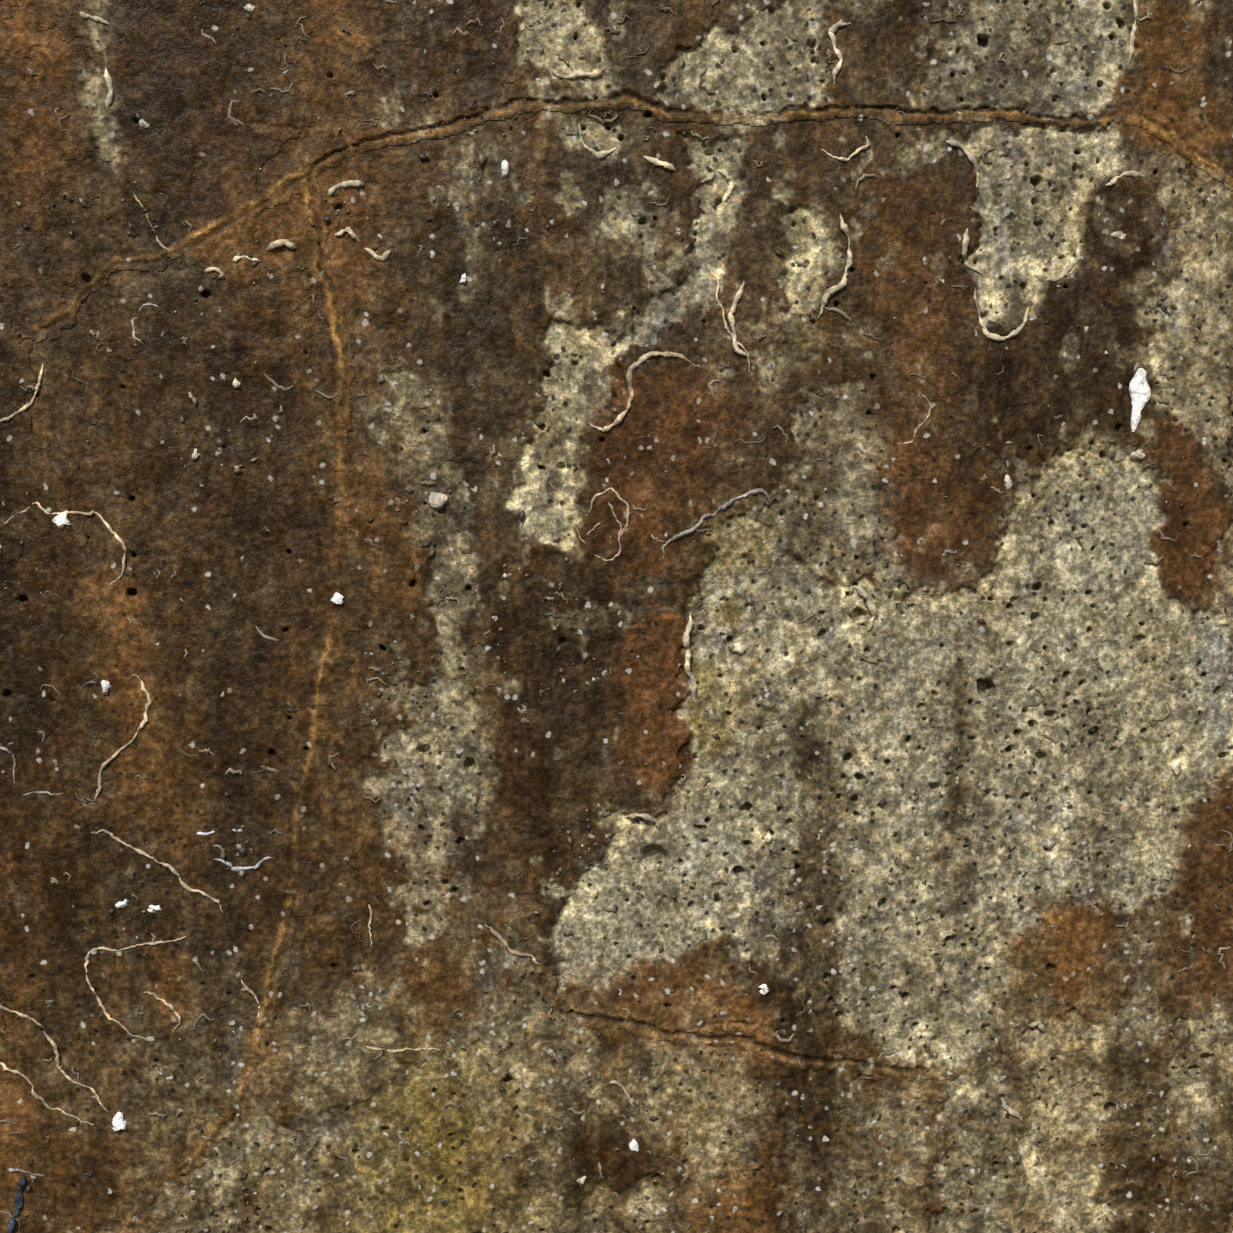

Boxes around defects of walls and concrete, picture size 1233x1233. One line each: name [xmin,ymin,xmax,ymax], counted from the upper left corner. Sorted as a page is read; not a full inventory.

corrosion [205,0,405,327]
corrosion [78,550,215,893]
crack [21,84,1233,595]
corrosion [530,322,763,825]
corrosion [827,122,1008,609]
corrosion [1140,409,1233,621]
corrosion [0,1020,72,1233]
corrosion [138,935,212,1039]
crack [110,592,344,1233]
crack [559,1009,1103,1081]
corrosion [990,745,1233,1048]
crack [1224,1195,1233,1233]